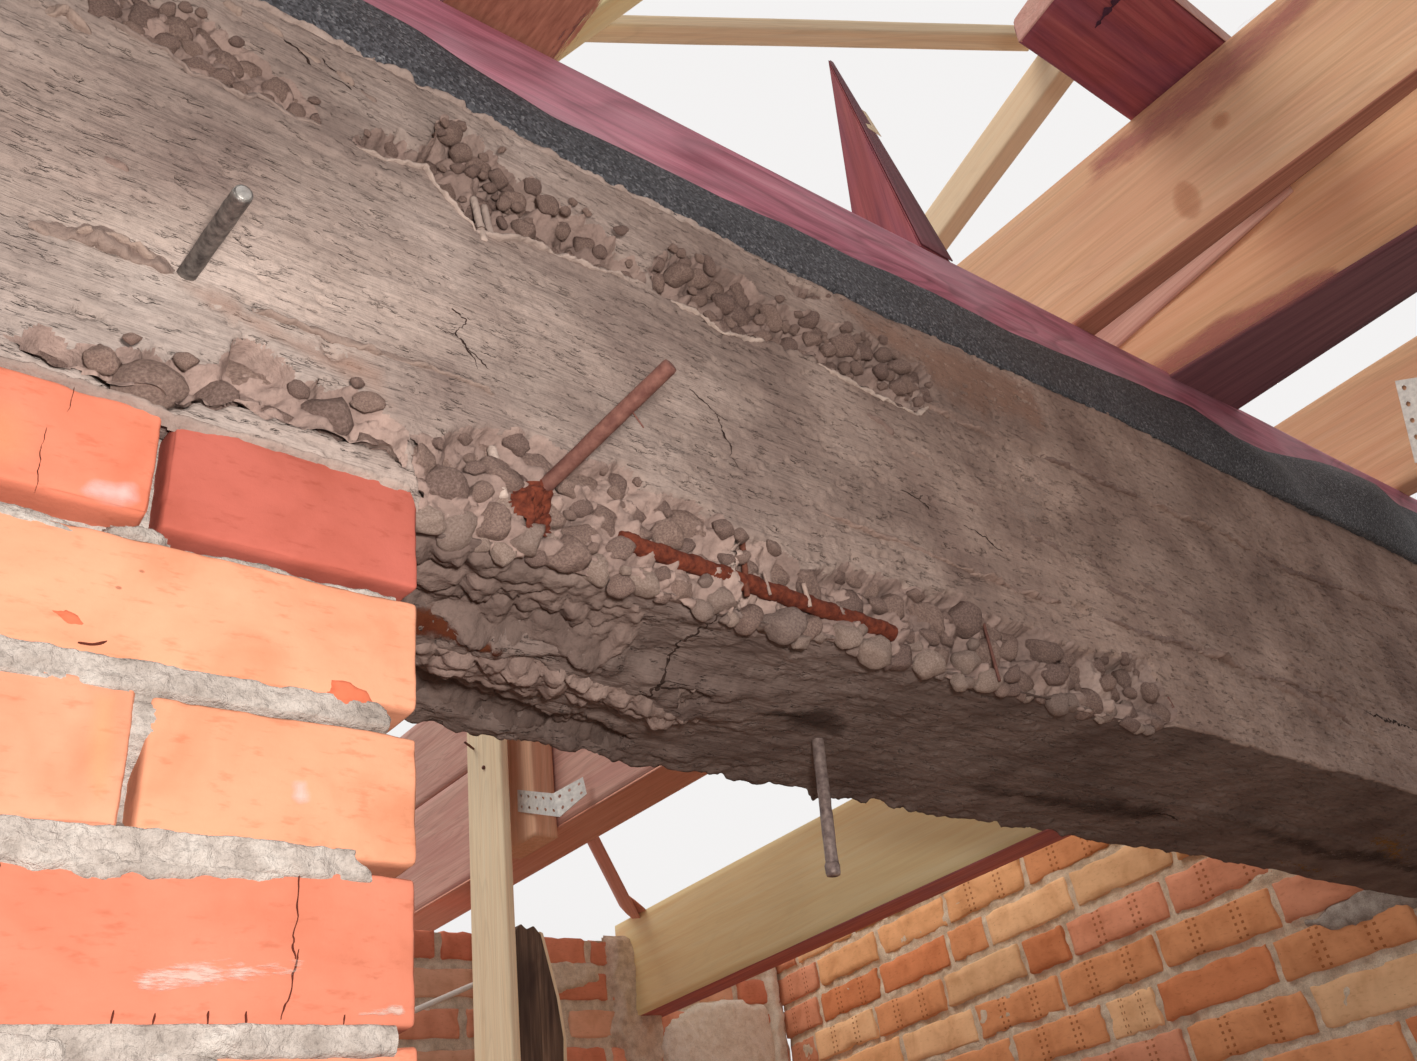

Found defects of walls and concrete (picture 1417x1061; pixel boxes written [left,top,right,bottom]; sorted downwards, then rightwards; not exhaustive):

peeling [337,335,432,369]
crack [35,387,75,491]
corrosion [508,359,676,537]
spalling [415,666,618,748]
crack [643,615,719,697]
crack [245,875,300,1023]